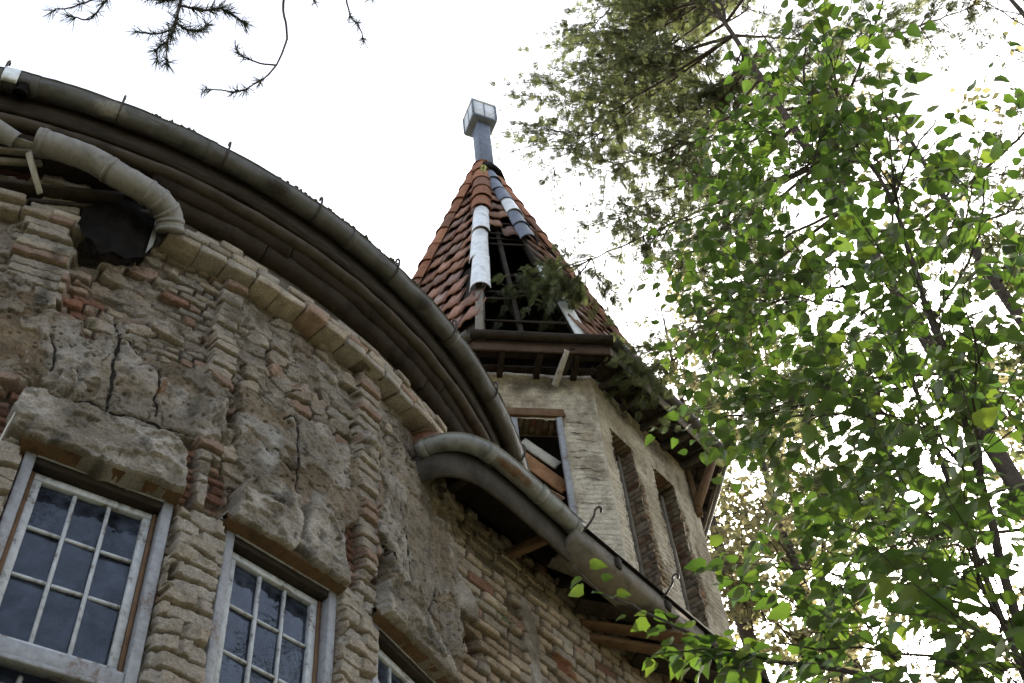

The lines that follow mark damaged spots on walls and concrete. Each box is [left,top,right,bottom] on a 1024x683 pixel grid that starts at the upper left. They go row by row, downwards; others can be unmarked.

spalling [55,230,223,373]
crack [50,342,78,373]
crack [77,324,195,438]
spalling [177,439,230,521]
crack [265,415,302,510]
spalling [344,520,396,594]
spalling [460,619,482,660]